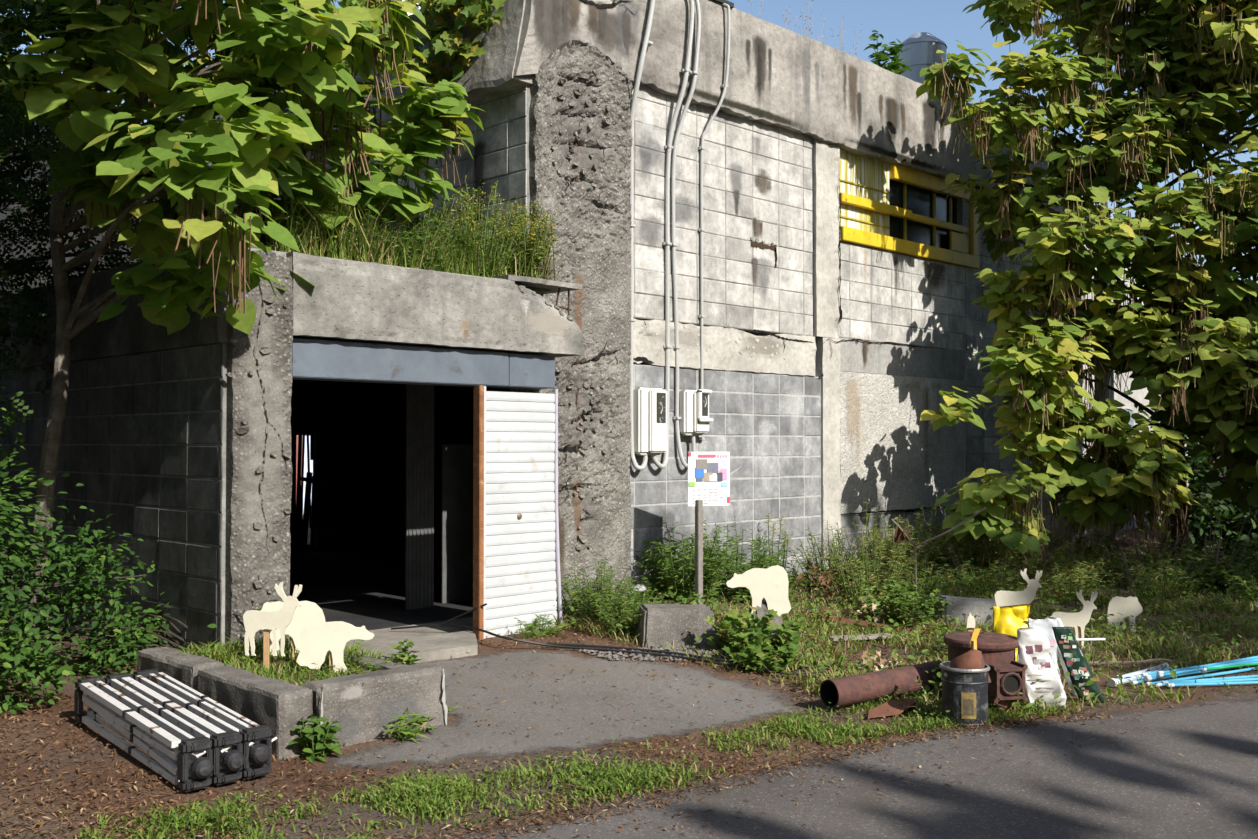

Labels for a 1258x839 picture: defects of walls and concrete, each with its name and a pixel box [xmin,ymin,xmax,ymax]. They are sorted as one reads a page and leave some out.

spalling [582,0,631,9]
damp [746,37,772,91]
spalling [550,78,611,188]
damp [844,64,861,123]
damp [879,95,905,140]
damp [756,172,771,192]
spalling [518,285,573,335]
crack [253,283,287,554]
spalling [555,365,608,550]